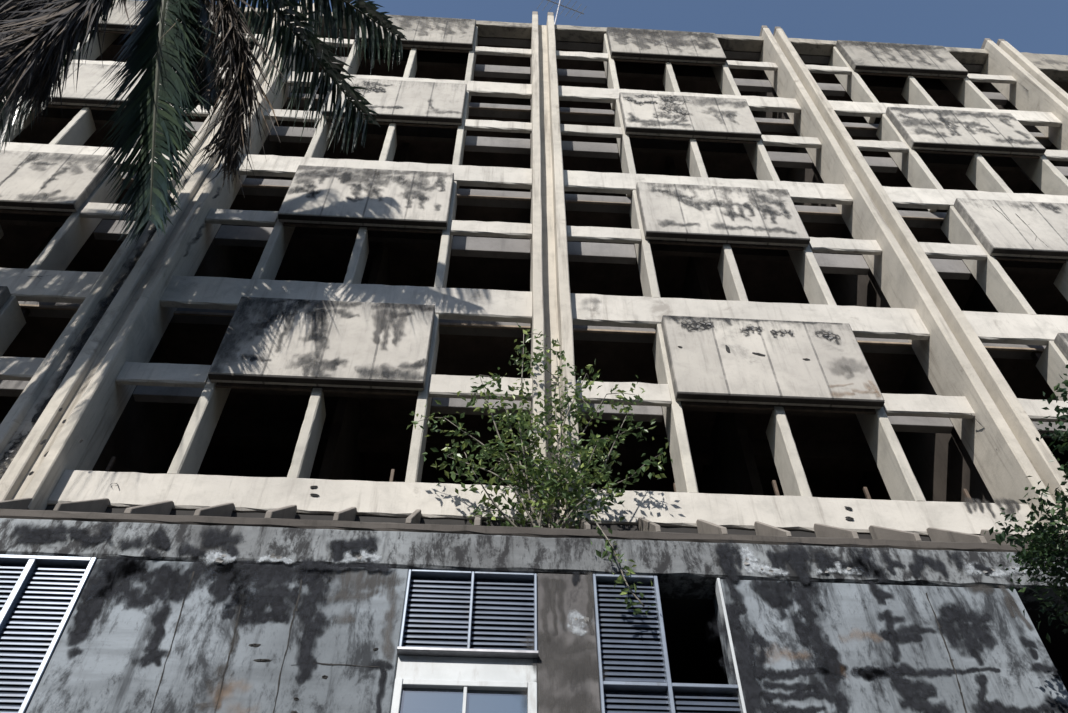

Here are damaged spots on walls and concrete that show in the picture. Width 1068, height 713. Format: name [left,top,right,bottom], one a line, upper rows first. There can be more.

water stain [3,154,68,201]
water stain [288,170,445,209]
water stain [653,189,796,234]
water stain [212,297,433,380]
water stain [663,315,837,324]
water stain [12,523,400,713]
water stain [716,541,1068,713]